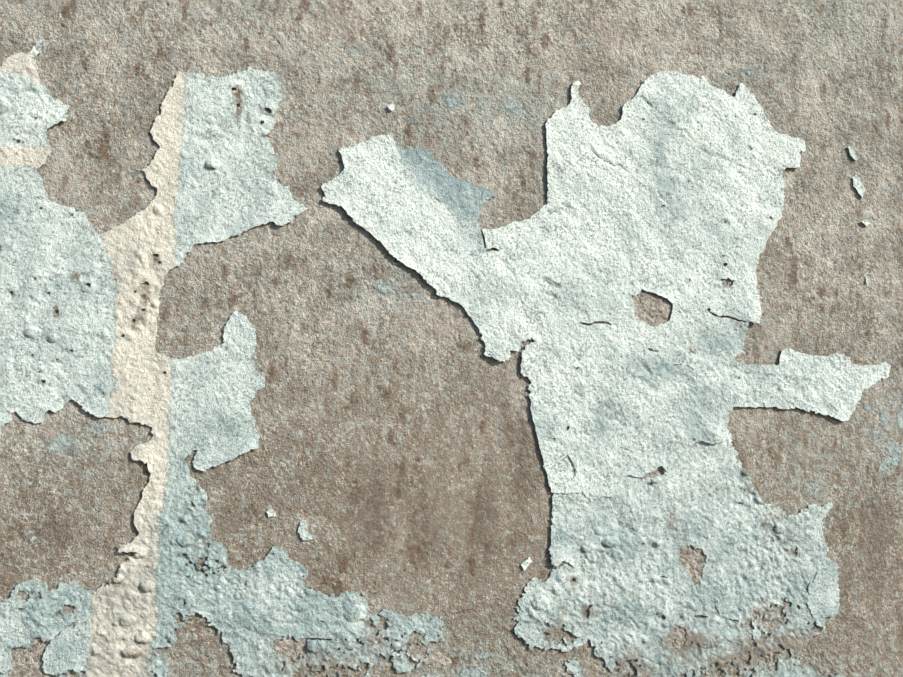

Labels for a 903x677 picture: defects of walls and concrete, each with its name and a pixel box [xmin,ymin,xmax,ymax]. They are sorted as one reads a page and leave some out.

peeling [0,38,495,677]
peeling [321,67,891,677]
peeling [871,404,903,473]